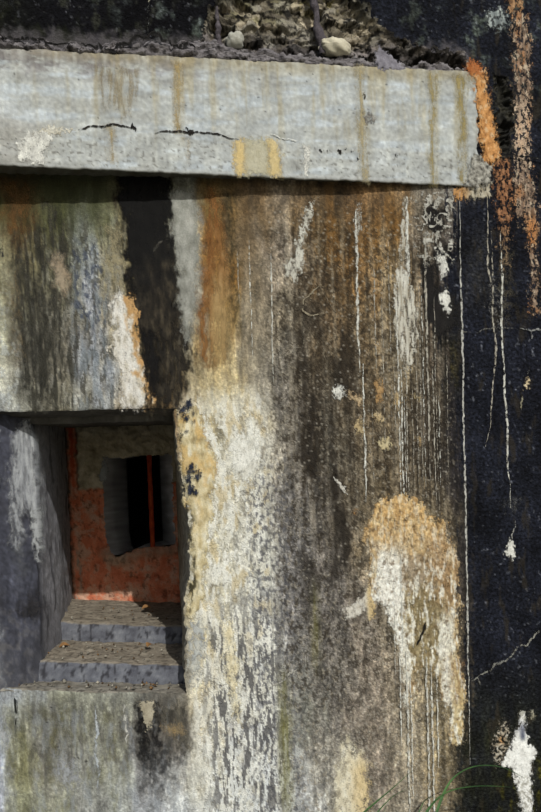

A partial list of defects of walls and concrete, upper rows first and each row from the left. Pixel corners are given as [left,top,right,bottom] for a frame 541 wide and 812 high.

crack [0,0,201,53]
crack [78,122,137,131]
crack [157,127,239,140]
corrosion [232,136,282,178]
spalling [198,0,469,72]
corrosion [453,0,541,318]
water stain [112,176,193,409]
corrosion [198,183,239,368]
water stain [353,203,374,489]
water stain [484,197,511,492]
water stain [373,187,470,743]
crack [473,632,537,684]